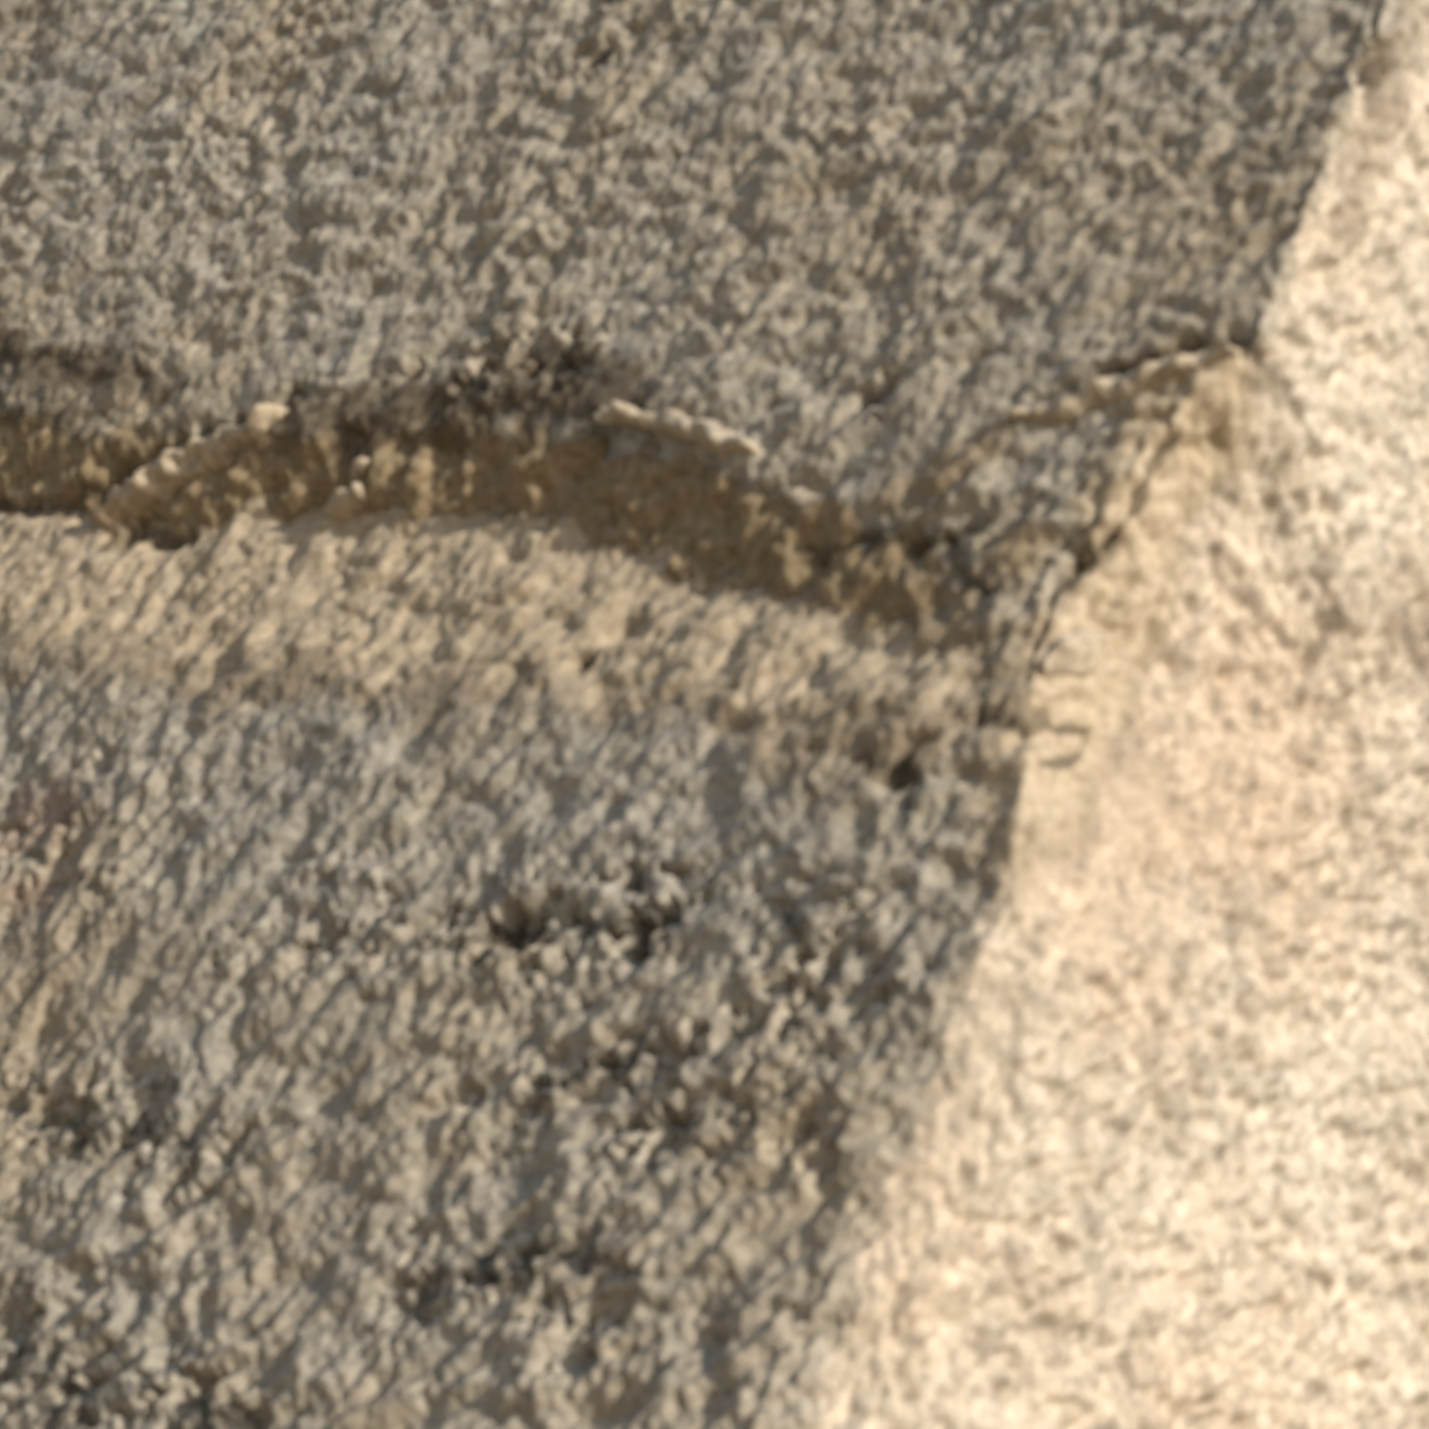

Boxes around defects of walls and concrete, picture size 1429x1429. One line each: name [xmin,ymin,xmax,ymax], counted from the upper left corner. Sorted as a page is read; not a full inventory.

crack [0,491,190,552]
crack [820,531,985,592]
crack [1036,441,1174,649]